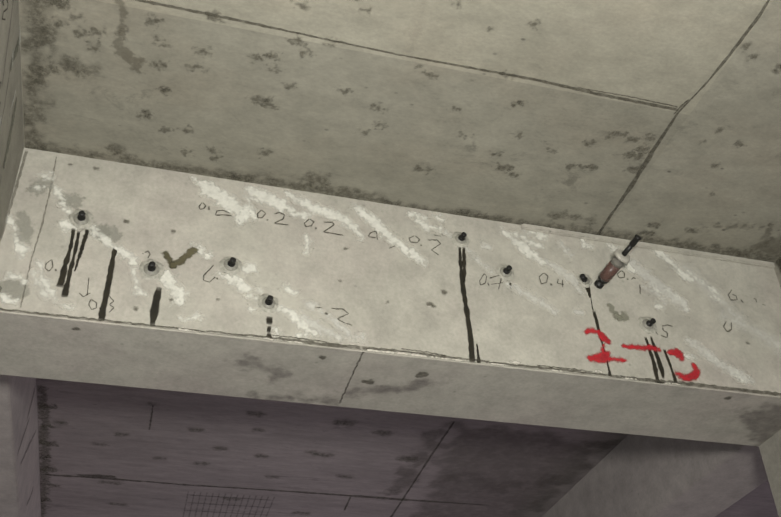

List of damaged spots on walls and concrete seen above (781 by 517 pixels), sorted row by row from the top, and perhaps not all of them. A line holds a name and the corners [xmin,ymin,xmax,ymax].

crack [0,90,27,190]
damp [269,175,389,203]
crack [137,0,770,233]
damp [641,223,781,272]
crack [0,297,781,401]